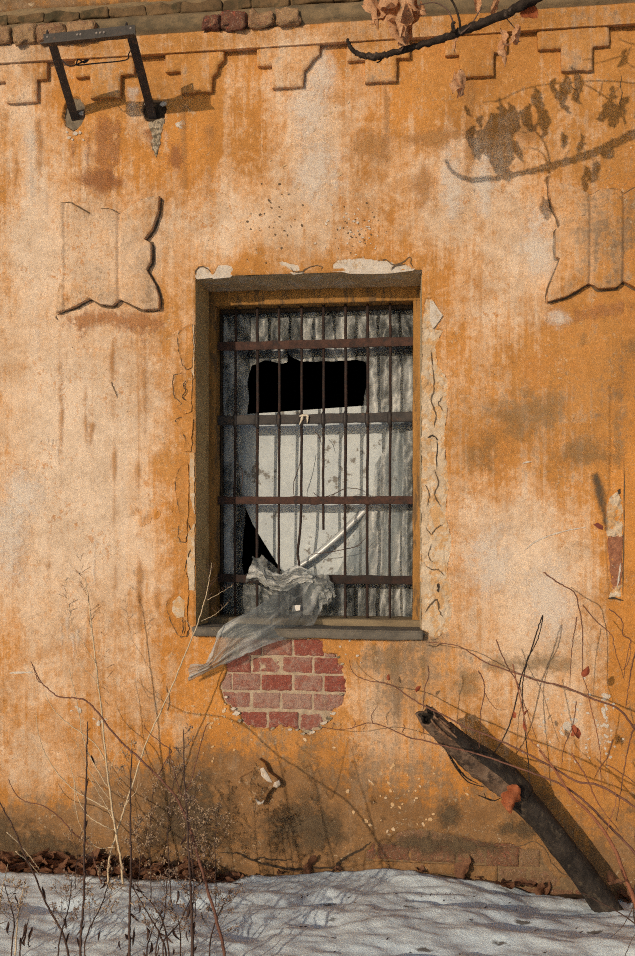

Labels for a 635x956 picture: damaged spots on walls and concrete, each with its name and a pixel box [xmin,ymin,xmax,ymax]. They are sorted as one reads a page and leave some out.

flaking render [65,99,85,141]
flaking render [143,100,183,157]
peeling [279,202,414,275]
peeling [195,265,233,280]
flaking render [166,324,195,638]
flaking render [420,299,453,638]
flaking render [189,638,361,762]
damp [0,817,78,859]
damp [142,773,230,856]
damp [265,799,343,849]
damp [387,804,496,854]